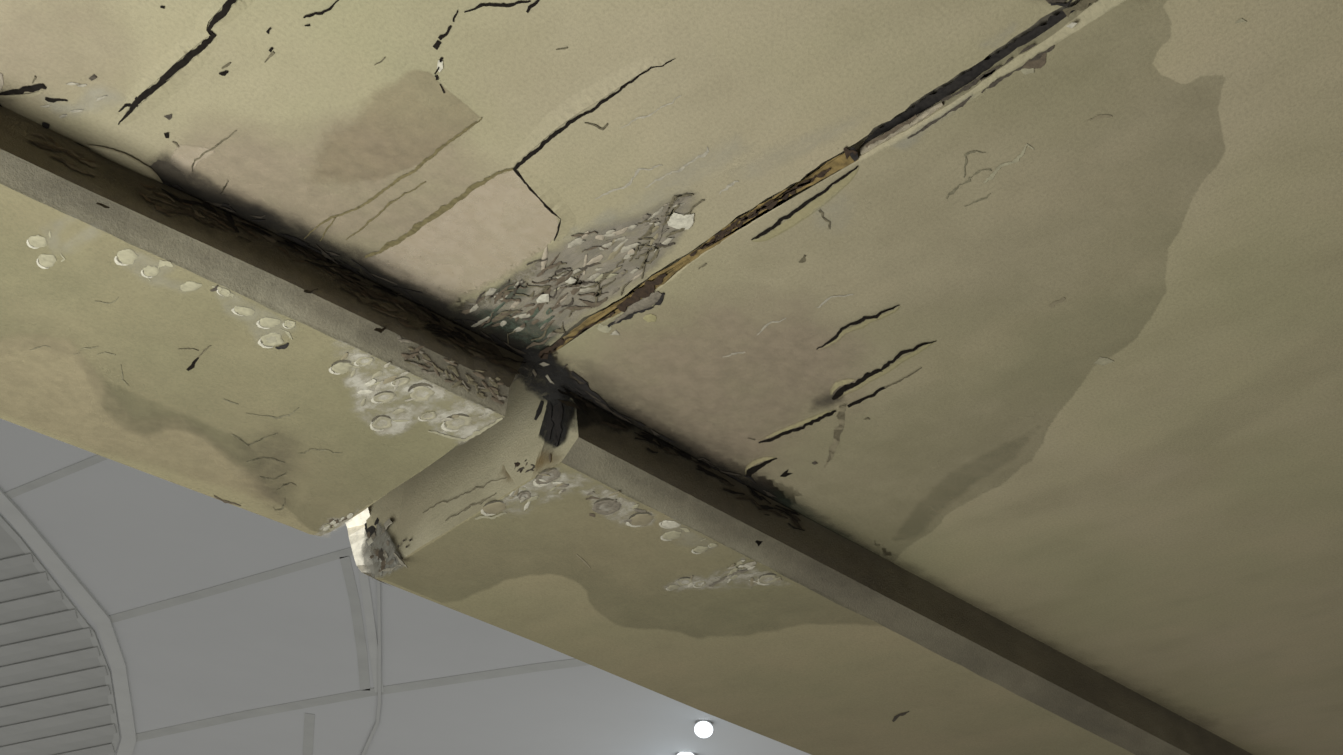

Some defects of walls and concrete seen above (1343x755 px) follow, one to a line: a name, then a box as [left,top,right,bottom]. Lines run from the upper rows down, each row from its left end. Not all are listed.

crack [117,0,255,126]
crack [433,0,540,93]
crack [192,130,237,171]
crack [511,57,675,242]
peeling [365,168,705,351]
crack [751,166,859,263]
leakage [139,158,805,531]
crack [816,305,901,351]
crack [744,340,936,477]
spalling [321,508,411,586]
leakage [666,560,782,591]